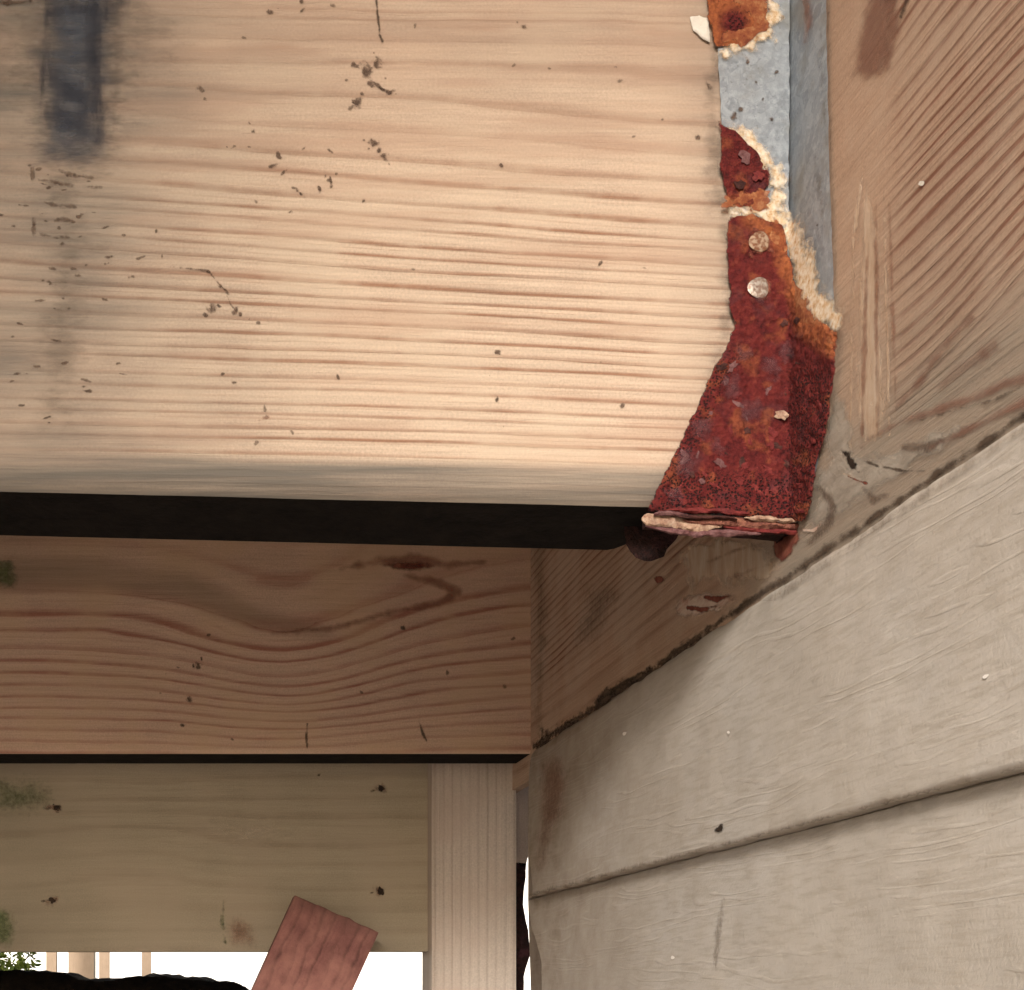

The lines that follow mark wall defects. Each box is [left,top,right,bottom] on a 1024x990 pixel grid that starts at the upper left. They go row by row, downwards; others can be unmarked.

water stain [48,0,110,156]
rust [707,0,781,58]
rust [642,121,841,561]